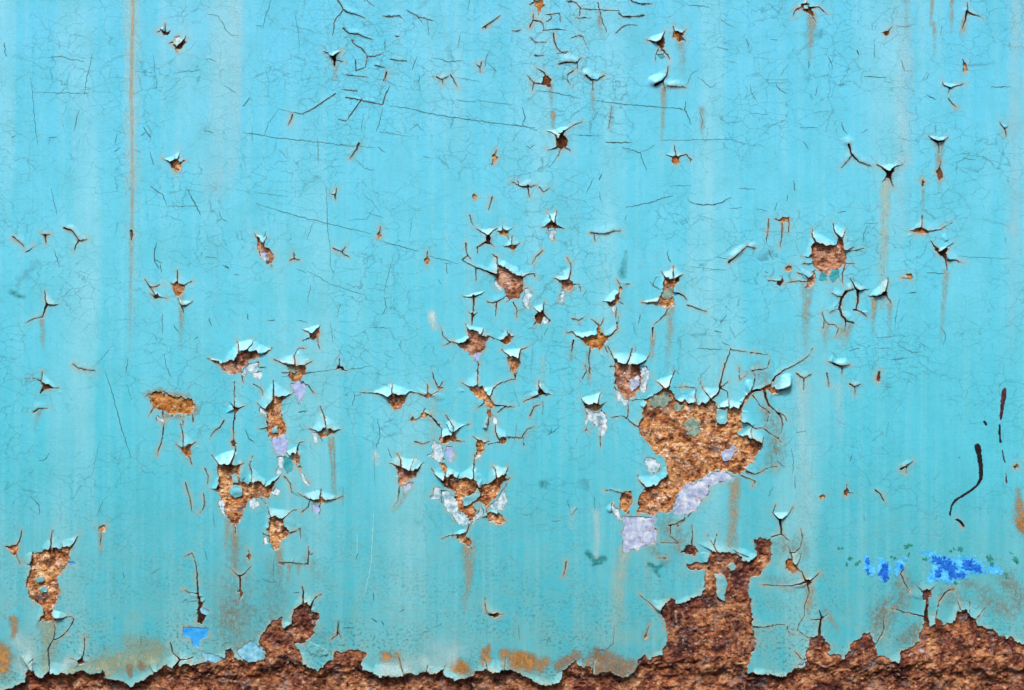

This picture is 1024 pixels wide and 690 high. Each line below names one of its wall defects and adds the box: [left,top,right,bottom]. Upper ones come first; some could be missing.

crack [208,0,962,193]
crack [256,188,550,413]
crack [591,181,795,289]
peeling [795,226,860,288]
crack [773,216,1011,396]
corrosion [149,389,197,451]
peeling [208,341,340,550]
peeling [392,325,521,547]
peeling [568,280,809,553]
peeling [6,537,78,625]
crack [183,553,210,648]
corrosion [0,481,1024,690]